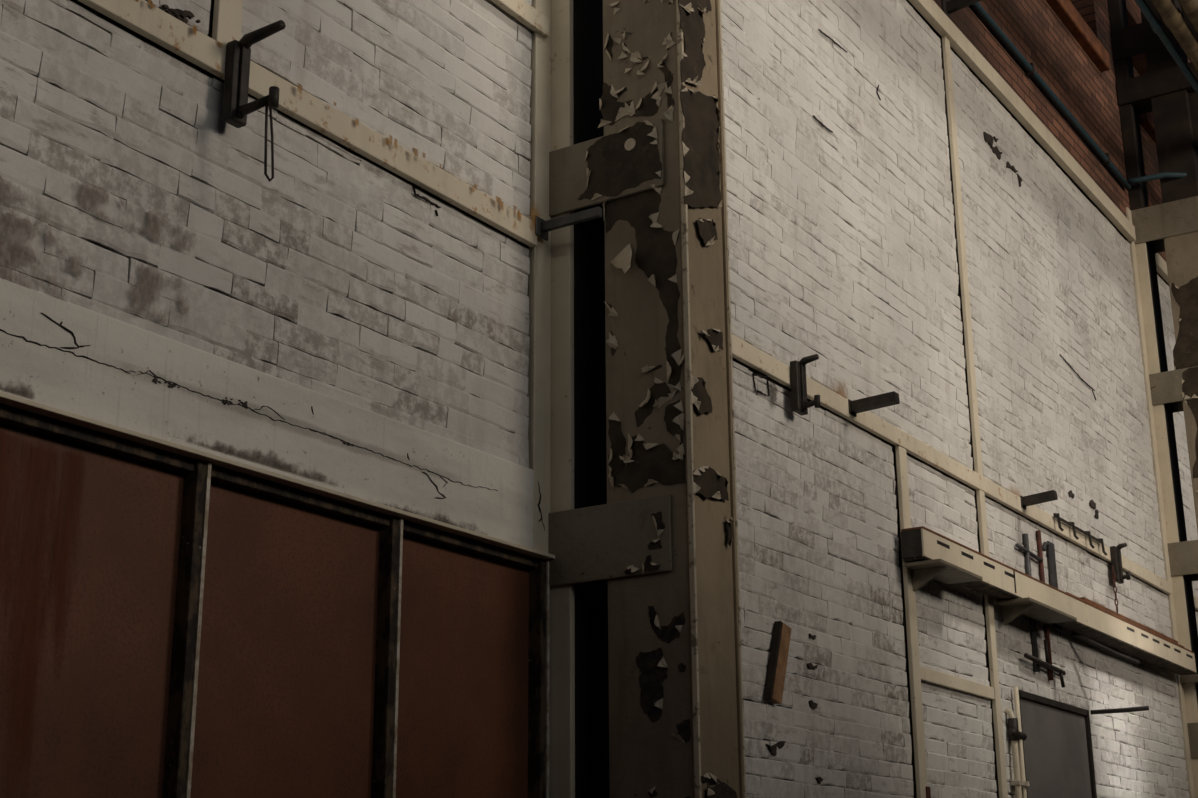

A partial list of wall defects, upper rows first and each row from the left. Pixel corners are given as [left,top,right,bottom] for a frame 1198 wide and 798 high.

spalling [983,132,1022,187]
peeling [578,0,734,547]
crack [0,313,497,499]
peeling [1171,276,1198,478]
peeling [624,512,665,574]
peeling [636,606,686,723]
peeling [701,772,737,798]